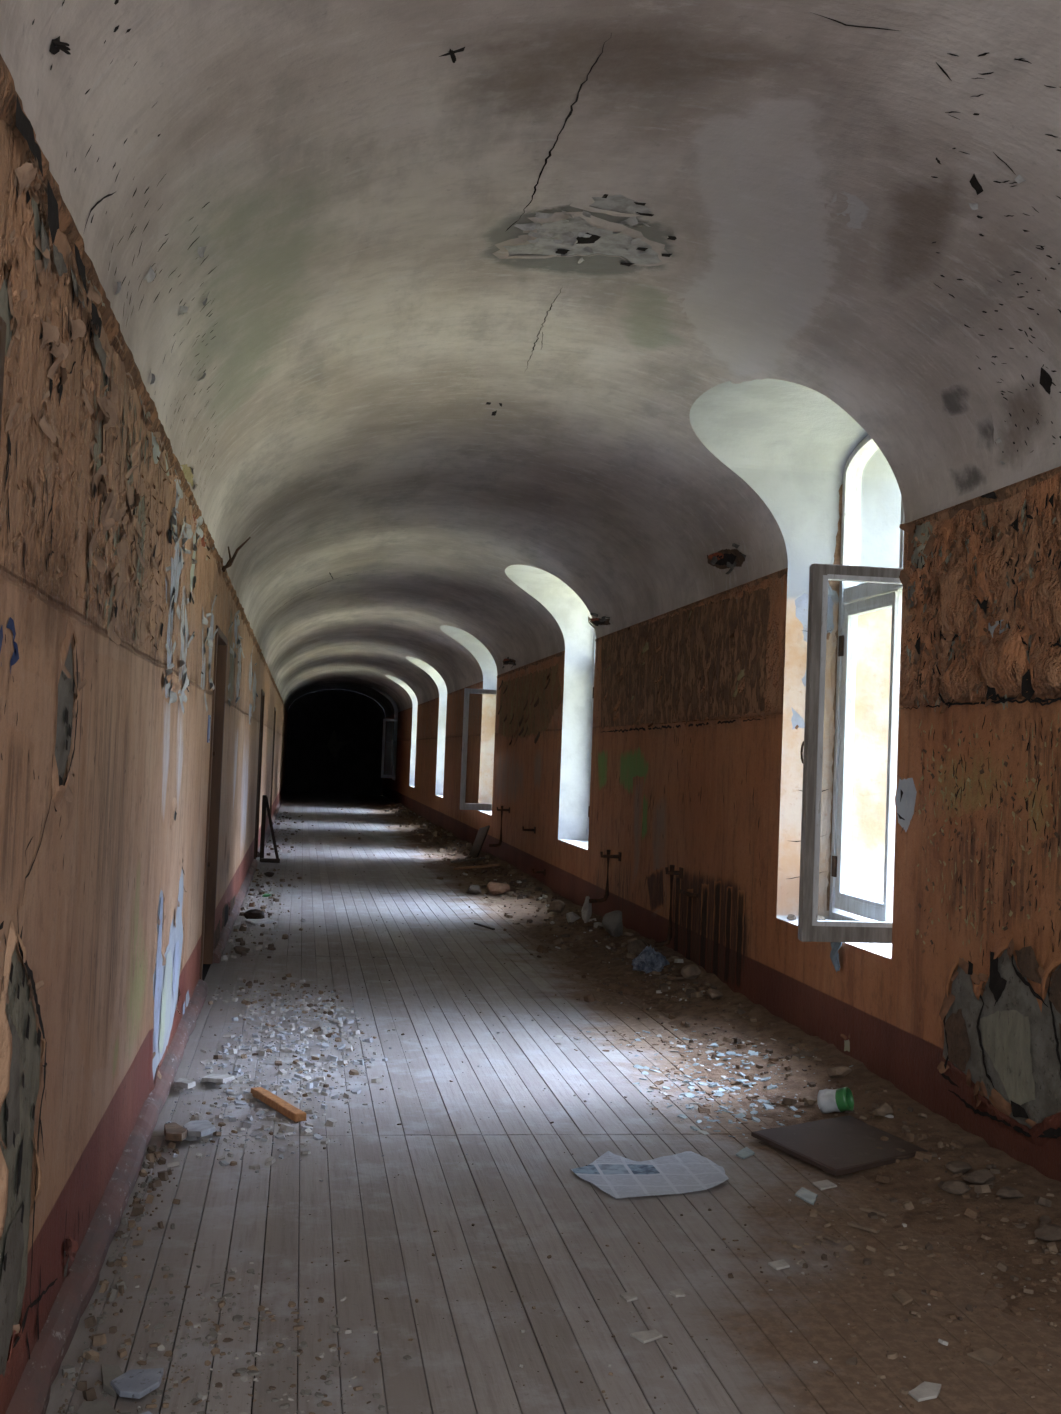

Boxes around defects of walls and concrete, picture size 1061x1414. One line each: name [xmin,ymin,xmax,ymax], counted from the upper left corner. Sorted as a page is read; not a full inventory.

crack [505,33,612,232]
peeling [968,174,1026,237]
spalling [0,54,284,840]
spalling [899,467,1061,616]
peeling [964,207,1061,465]
spalling [0,911,48,1377]
peeling [128,798,190,1093]
spalling [937,937,1061,1146]